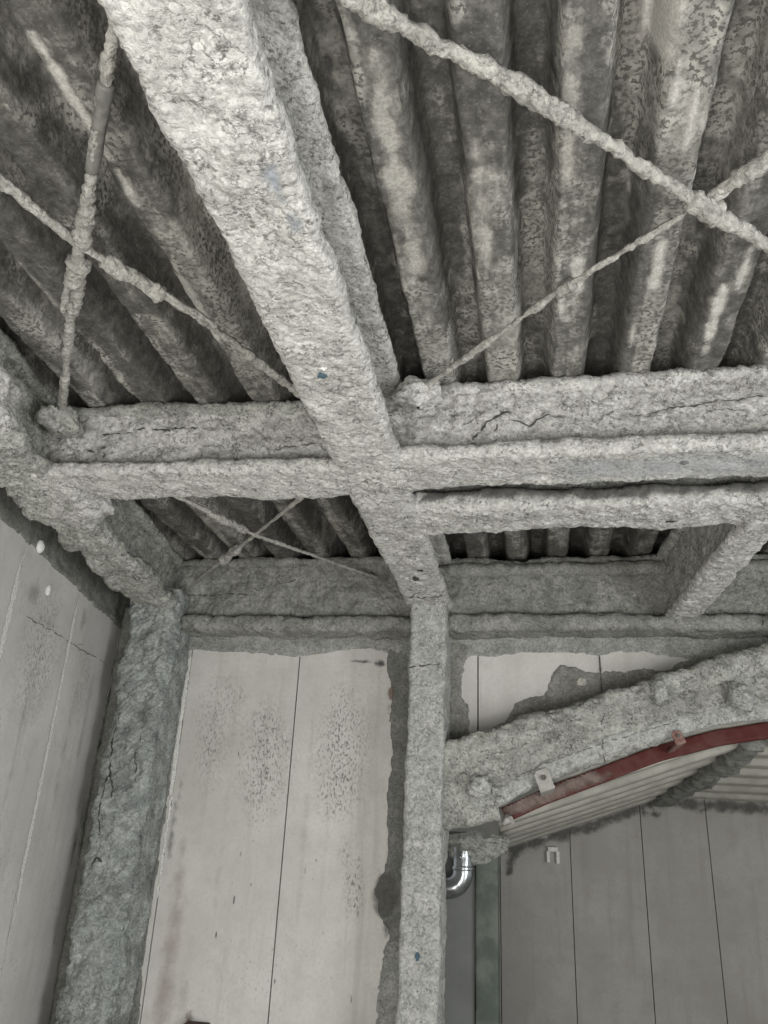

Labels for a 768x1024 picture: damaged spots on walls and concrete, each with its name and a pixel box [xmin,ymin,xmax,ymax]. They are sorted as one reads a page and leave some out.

crack [462,411,550,439]
crack [91,714,141,867]
damp [374,876,395,914]